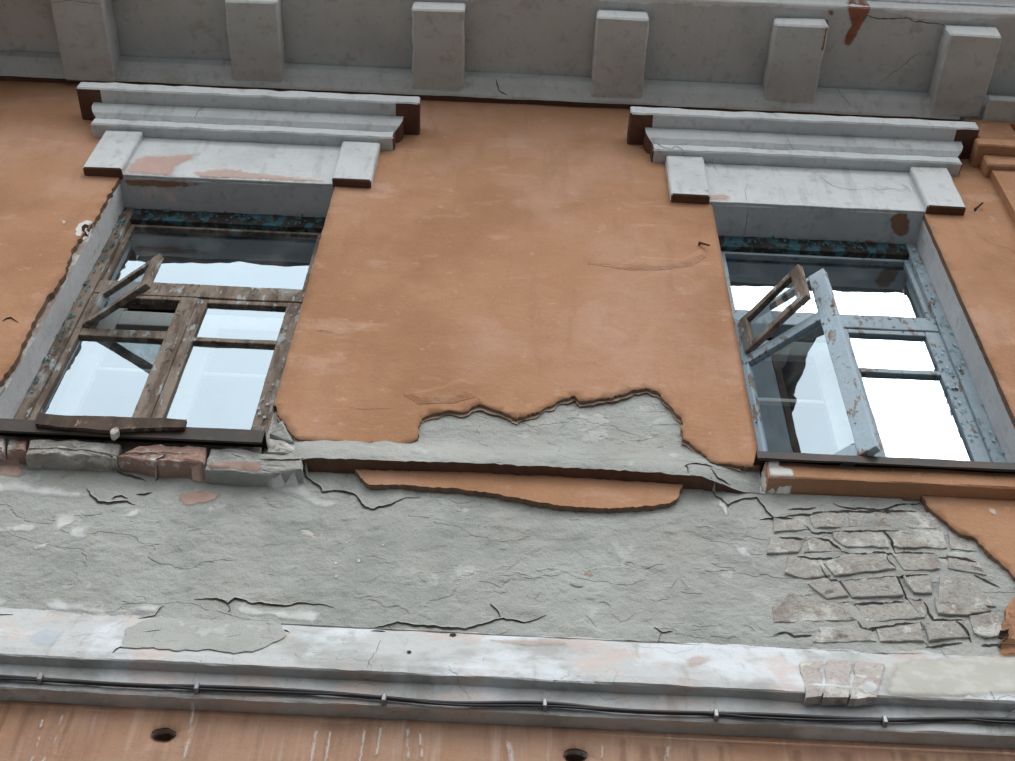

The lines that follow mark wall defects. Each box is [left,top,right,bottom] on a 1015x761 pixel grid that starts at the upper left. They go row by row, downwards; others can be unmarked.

rust [845,0,870,45]
crack [867,15,946,28]
crack [0,447,188,505]
crack [266,458,418,510]
flaking render [0,394,1015,706]
crack [203,596,334,637]
crack [368,592,545,664]
crack [569,583,671,643]